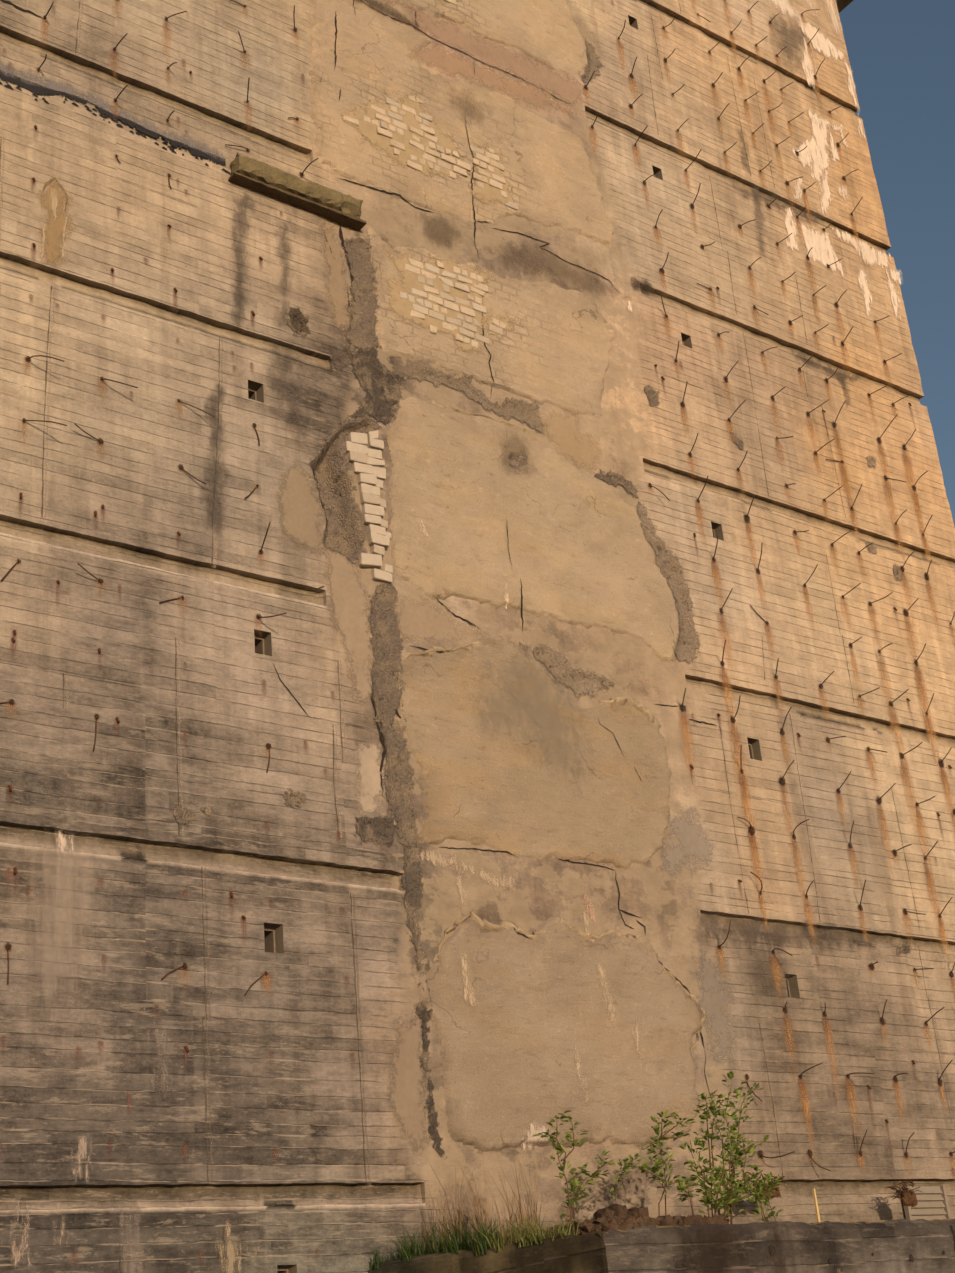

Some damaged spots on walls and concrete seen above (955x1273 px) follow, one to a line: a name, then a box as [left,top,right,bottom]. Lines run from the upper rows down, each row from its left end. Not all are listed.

leakage [0,63,223,159]
crack [334,0,570,104]
leakage [768,0,865,137]
crack [465,120,619,292]
leakage [783,109,901,320]
flaking render [310,236,544,564]
spalling [595,469,701,664]
crack [370,678,401,802]
rust [717,713,748,811]
rust [889,660,931,731]
rust [936,759,955,827]
spalling [354,583,447,1158]